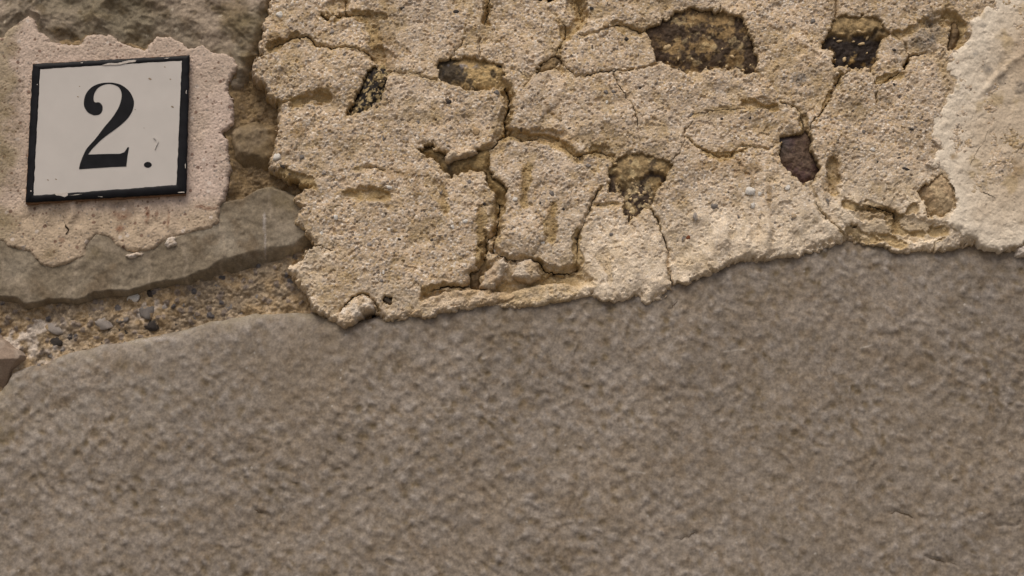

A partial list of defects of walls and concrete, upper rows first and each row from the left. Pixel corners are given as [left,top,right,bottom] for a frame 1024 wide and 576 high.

crack [270,36,373,60]
hole [348,63,389,116]
spalling [437,58,506,91]
crack [491,70,537,149]
crack [557,1,641,139]
spalling [646,8,757,74]
crack [674,71,850,158]
spalling [821,13,889,72]
spalling [608,153,673,222]
spalling [779,131,819,184]
crack [485,189,613,275]
crack [650,209,676,307]